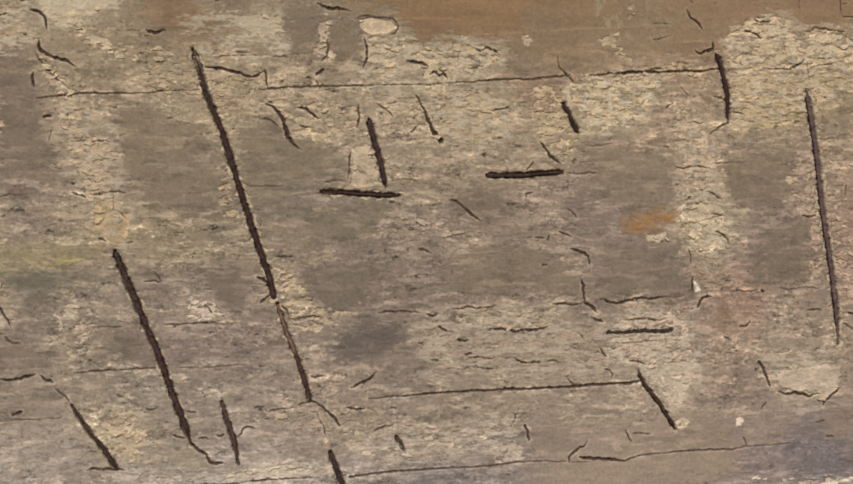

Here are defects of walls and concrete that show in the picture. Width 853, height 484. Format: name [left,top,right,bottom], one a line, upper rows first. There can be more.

crack [31,9,198,142]
crack [205,1,719,150]
spalling [486,168,565,181]
spalling [532,16,853,348]
crack [166,305,217,325]
crack [256,276,320,320]
crack [270,209,670,434]
crack [173,426,255,465]
crack [349,425,787,478]
crack [232,476,312,484]